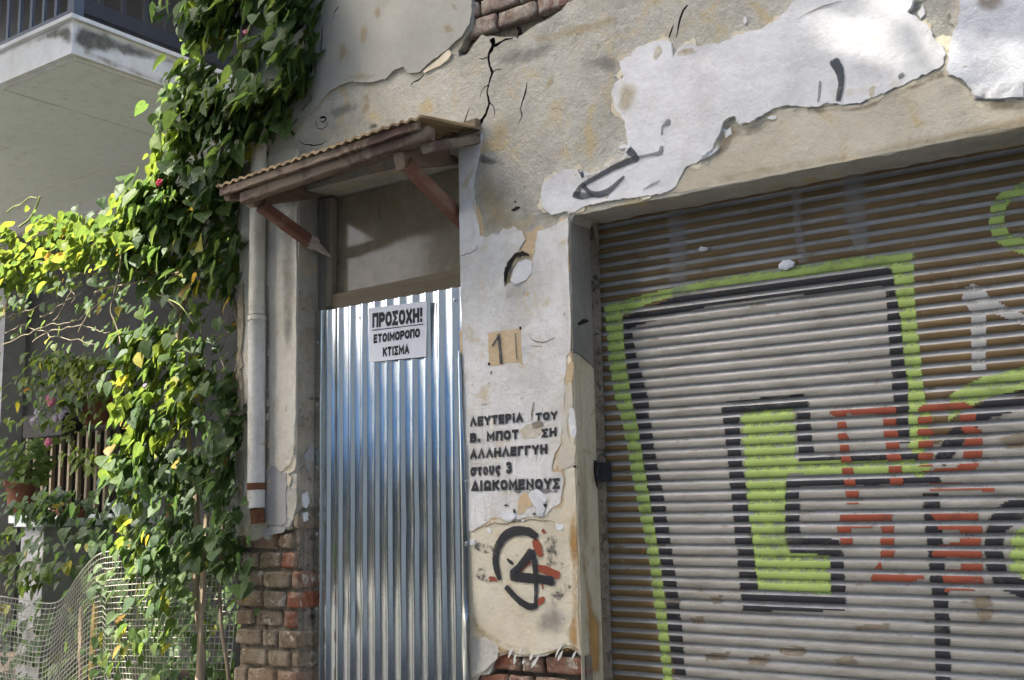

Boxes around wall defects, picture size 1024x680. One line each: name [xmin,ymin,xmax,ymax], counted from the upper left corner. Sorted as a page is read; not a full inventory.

peeling [246,0,572,168]
crack [464,26,522,124]
peeling [234,201,316,680]
peeling [458,0,1024,680]